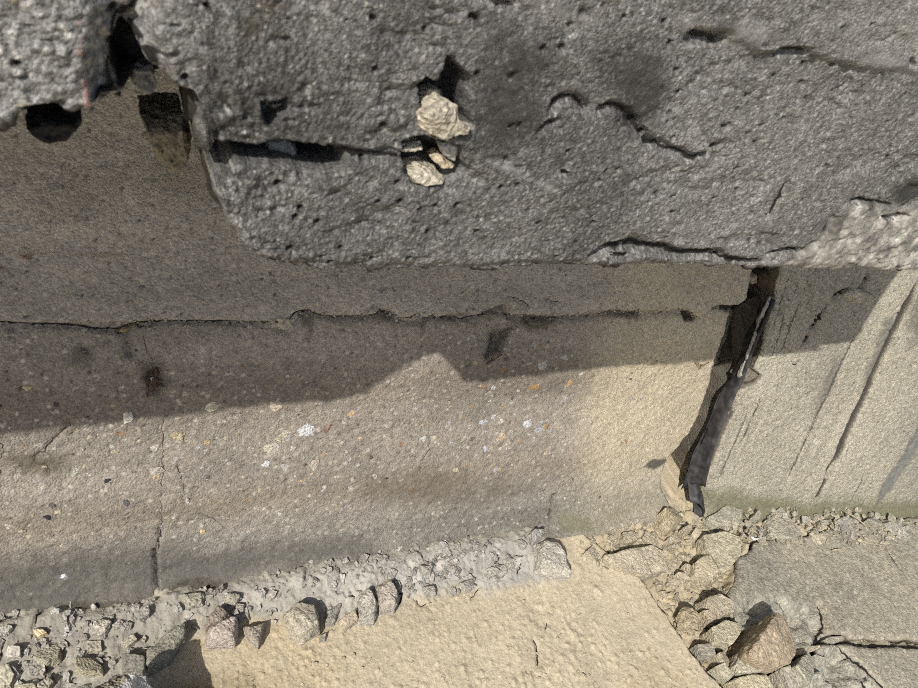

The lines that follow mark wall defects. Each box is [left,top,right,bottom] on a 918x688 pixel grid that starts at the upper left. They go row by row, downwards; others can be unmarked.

crack [539,93,716,160]
crack [0,295,567,395]
spalling [28,501,62,520]
spalling [111,403,140,453]
crack [152,418,184,587]
spalling [145,437,227,505]
spalling [238,406,334,469]
spalling [300,453,327,502]
spalling [393,354,596,489]
crack [813,607,883,688]